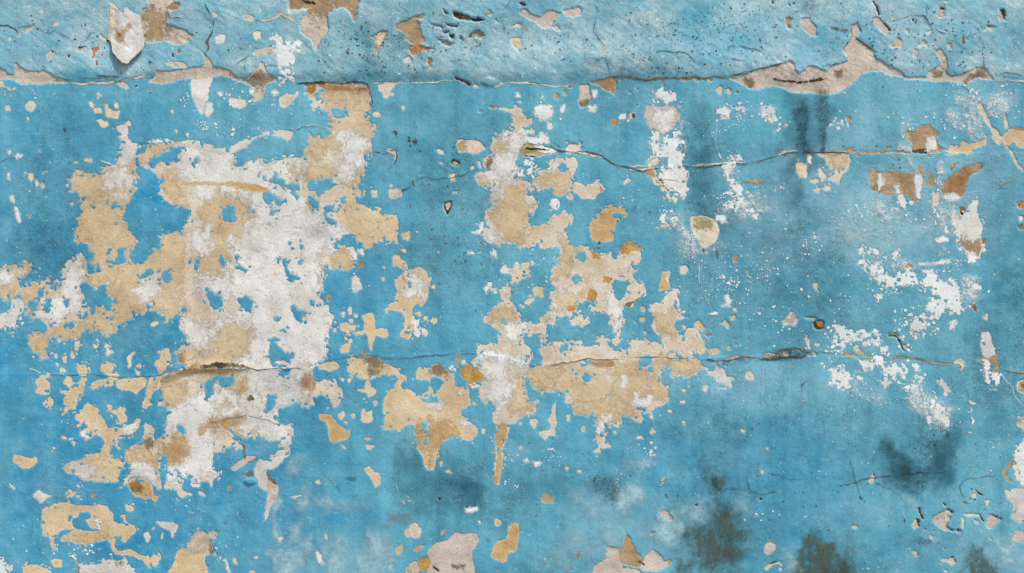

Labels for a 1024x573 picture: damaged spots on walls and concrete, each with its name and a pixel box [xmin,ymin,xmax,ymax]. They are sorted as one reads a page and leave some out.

crack [70,75,145,86]
crack [296,76,455,105]
water stain [798,91,829,154]
crack [556,149,847,184]
spalling [682,2,1024,427]
peeling [0,0,784,573]
crack [533,347,832,391]
crack [886,356,969,397]
water stain [586,459,654,515]
water stain [653,502,748,573]
water stain [788,533,856,573]
water stain [965,538,1024,573]